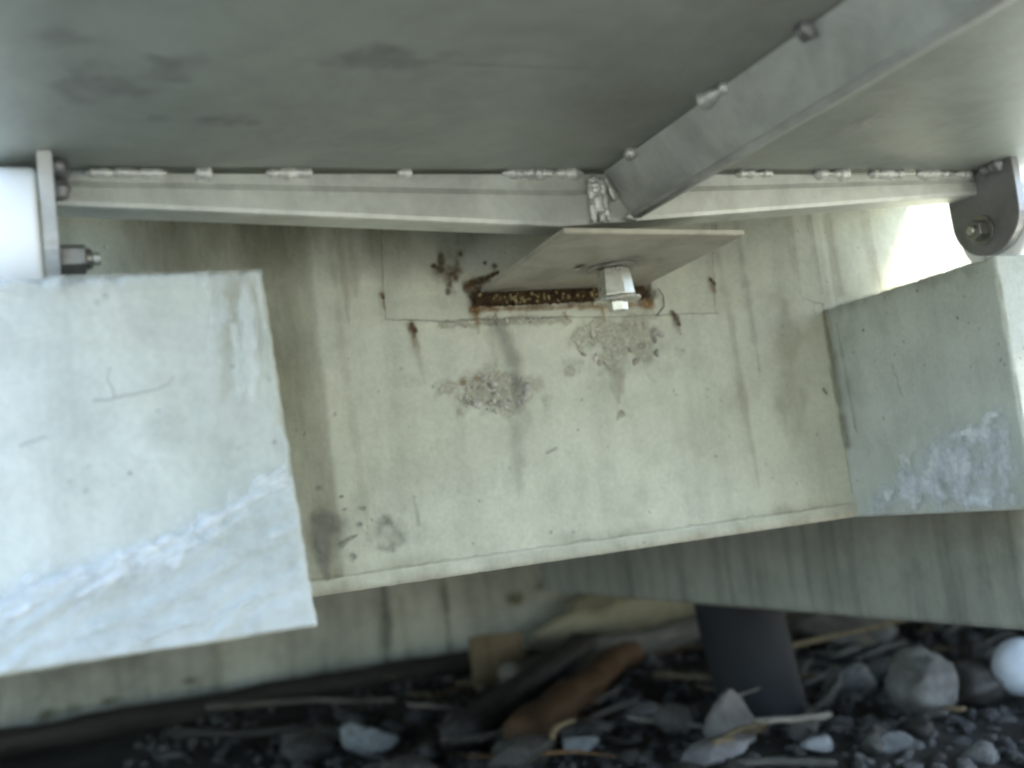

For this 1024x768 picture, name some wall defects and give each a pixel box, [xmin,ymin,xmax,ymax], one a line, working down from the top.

rust [431,252,604,324]
rust [629,283,656,307]
spalling [439,314,665,372]
spalling [438,365,541,416]
water stain [313,513,362,579]